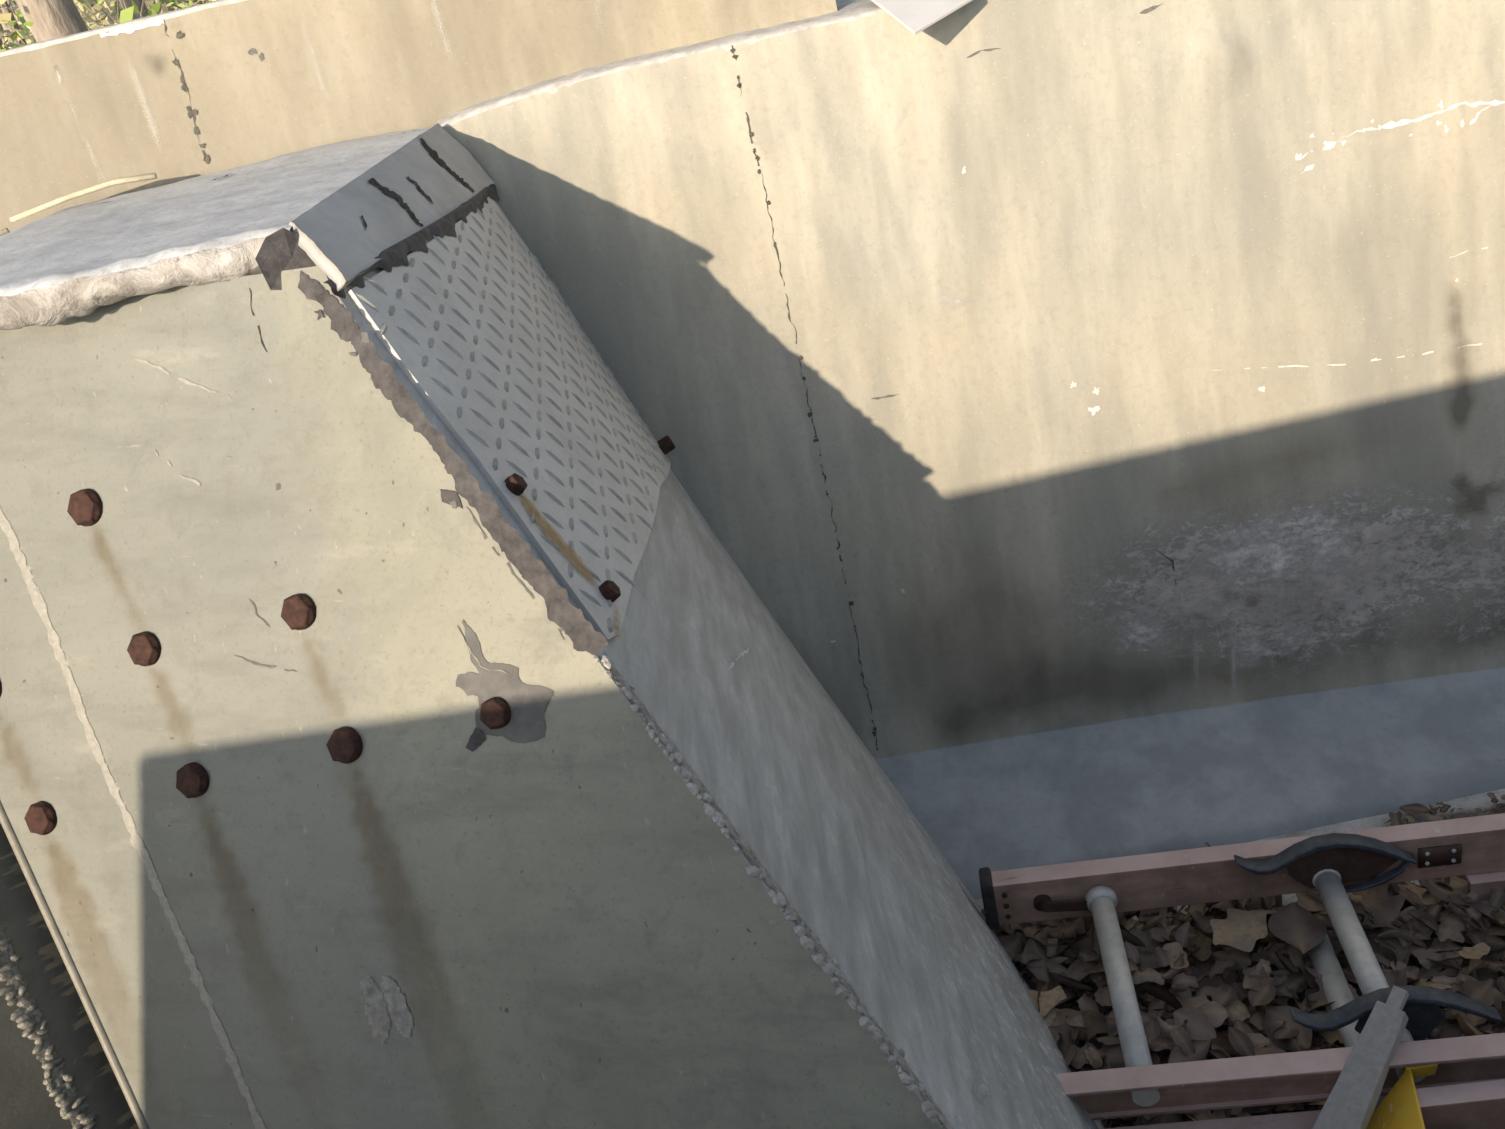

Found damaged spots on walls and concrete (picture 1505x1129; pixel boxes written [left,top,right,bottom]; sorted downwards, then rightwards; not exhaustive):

peeling [298,270,953,1129]
crack [730,45,878,750]